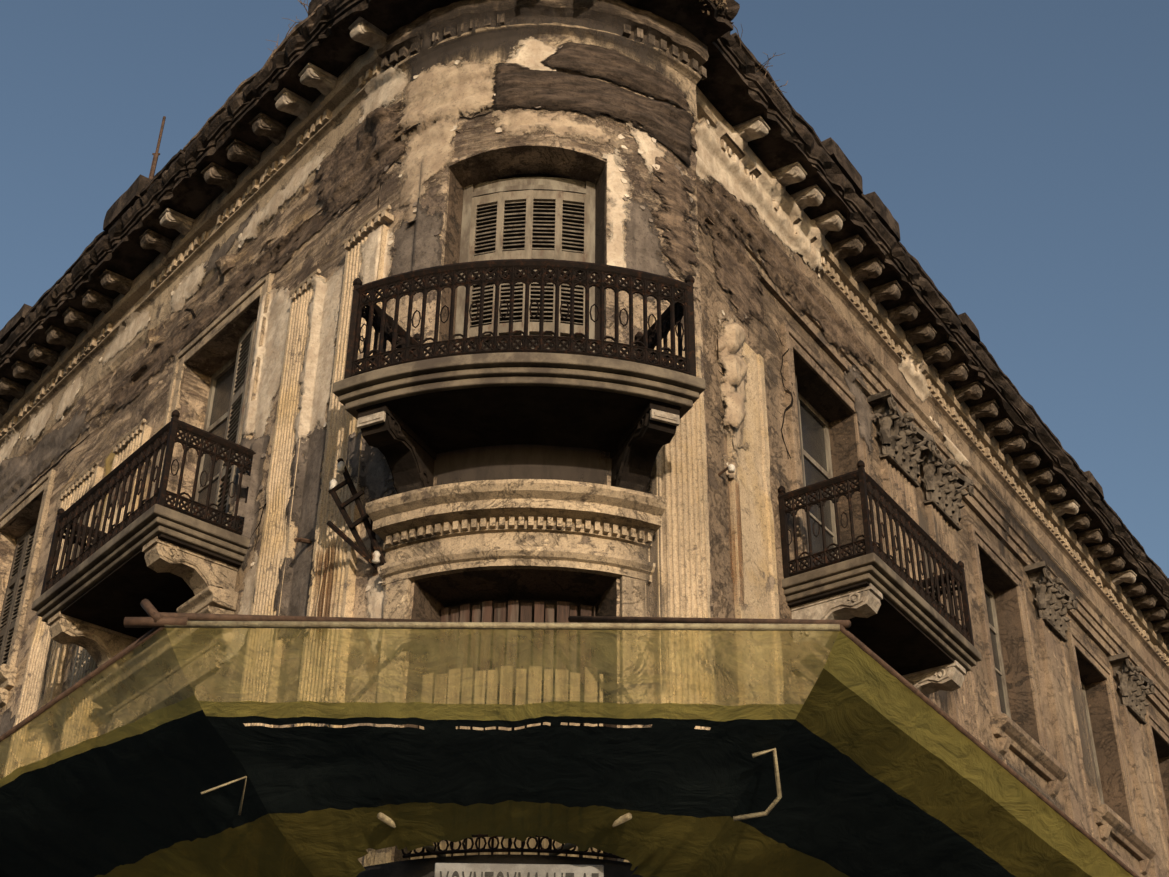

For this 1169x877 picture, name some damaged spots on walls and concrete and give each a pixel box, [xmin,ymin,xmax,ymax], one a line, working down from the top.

flaking render [0,375,85,464]
spalling [94,37,883,664]
crack [775,330,798,462]
corrosion [315,546,335,636]